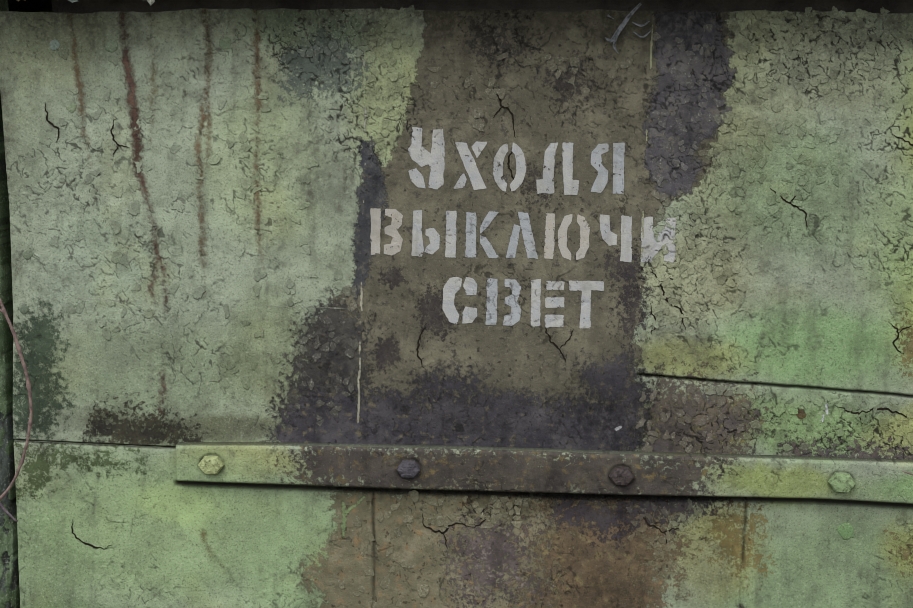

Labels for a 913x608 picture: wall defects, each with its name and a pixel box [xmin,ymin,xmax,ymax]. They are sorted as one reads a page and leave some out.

rust [67,13,84,116]
rust [119,12,155,228]
rust [195,8,212,193]
rust [253,10,261,110]
rust [148,239,168,306]
peeling [252,3,902,454]
crack [545,327,573,363]
damp [13,299,154,503]
crack [835,405,907,424]
peeling [835,402,913,460]
crack [71,520,111,550]
crack [422,513,486,549]